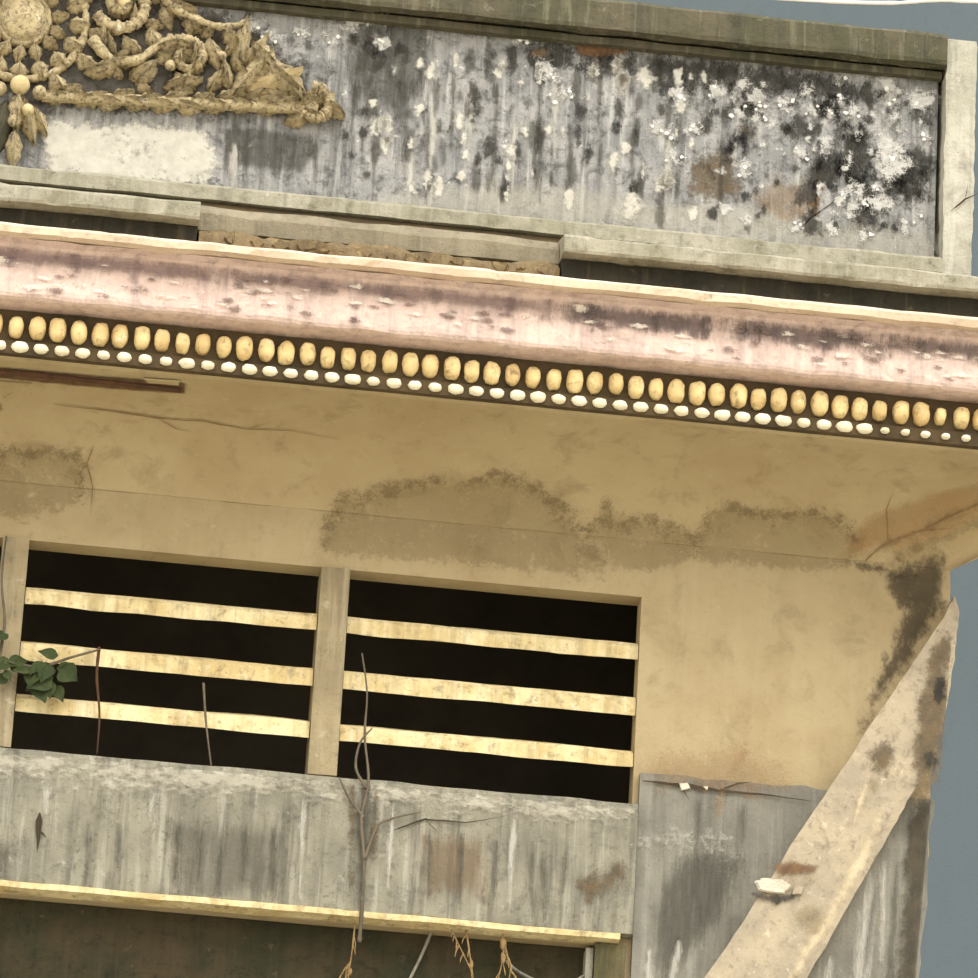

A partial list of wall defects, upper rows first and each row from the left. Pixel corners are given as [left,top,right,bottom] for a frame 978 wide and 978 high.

damp [491,40,637,80]
damp [612,98,625,132]
damp [475,126,522,177]
damp [653,56,937,241]
damp [0,249,214,280]
damp [234,271,535,309]
damp [562,305,727,339]
damp [737,322,879,355]
damp [890,335,978,359]
damp [856,558,943,699]
damp [74,762,274,790]
damp [898,637,951,978]